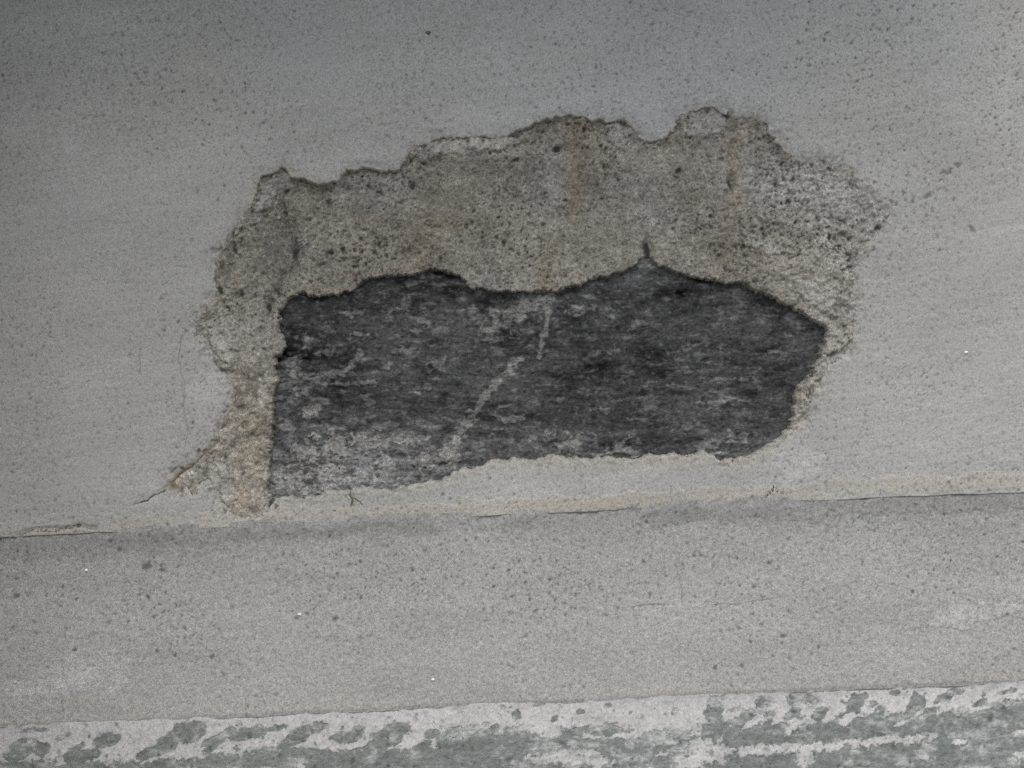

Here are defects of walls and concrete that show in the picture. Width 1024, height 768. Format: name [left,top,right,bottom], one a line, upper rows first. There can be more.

spalling [175,108,894,521]
crack [23,524,87,535]